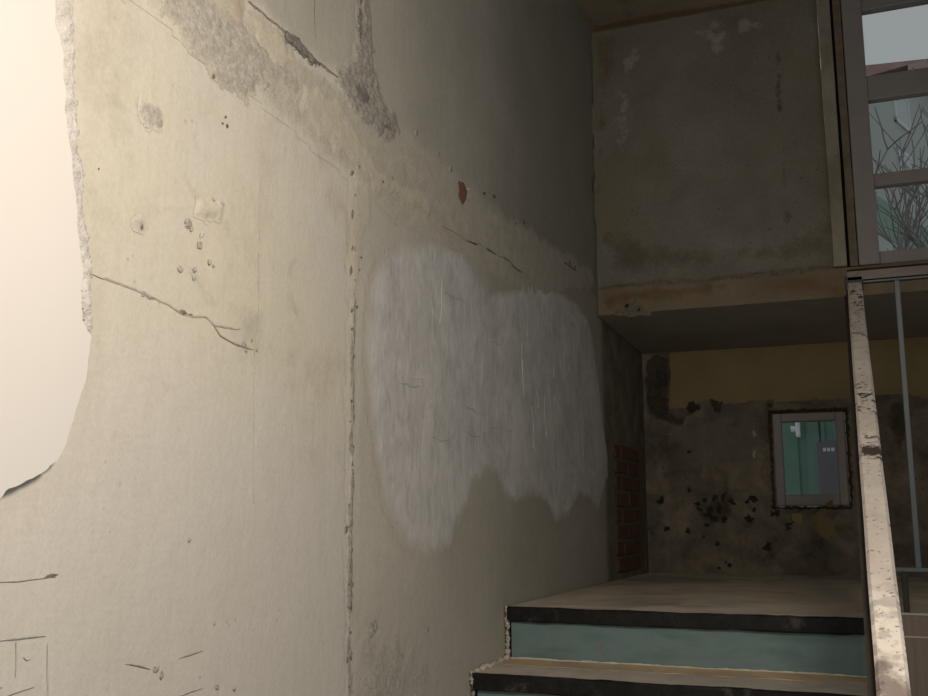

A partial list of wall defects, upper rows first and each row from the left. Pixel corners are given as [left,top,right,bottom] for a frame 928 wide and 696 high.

crack [248,1,338,78]
peeling [0,0,94,498]
crack [444,227,531,278]
crack [92,274,258,352]
crack [342,165,374,696]
peeling [668,342,851,417]
peeling [868,337,928,459]